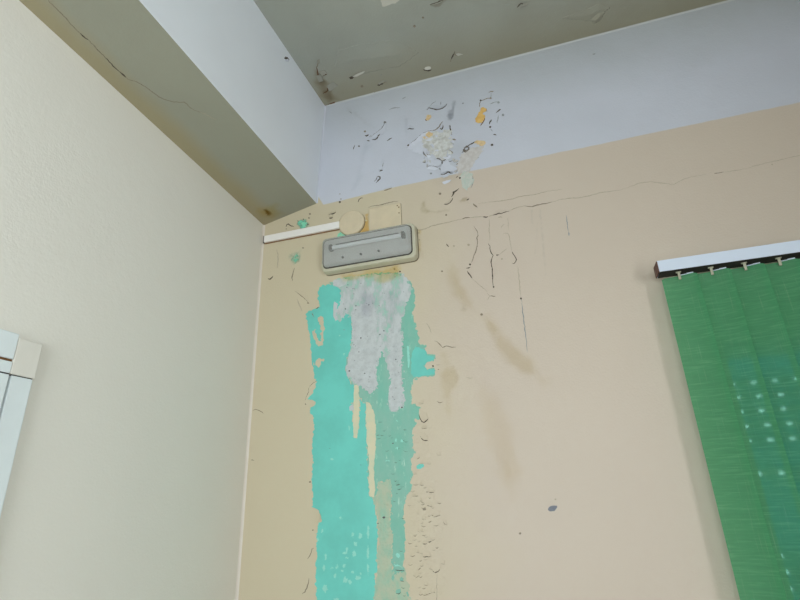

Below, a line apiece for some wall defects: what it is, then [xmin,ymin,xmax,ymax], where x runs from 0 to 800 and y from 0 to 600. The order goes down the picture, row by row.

crack [48,0,216,120]
peeling [407,122,486,190]
peeling [475,91,494,125]
crack [421,155,799,347]
peeling [302,272,436,600]